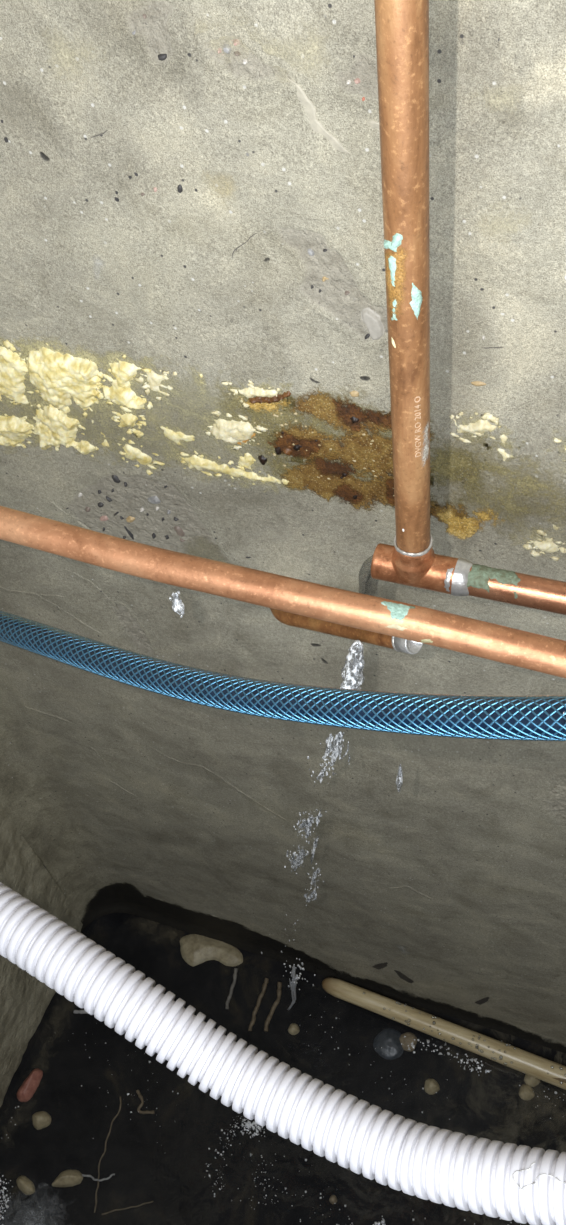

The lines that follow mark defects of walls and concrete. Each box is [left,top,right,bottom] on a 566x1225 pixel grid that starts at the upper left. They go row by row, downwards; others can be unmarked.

water stain [0,340,289,485]
corrosion [226,389,395,511]
water stain [449,412,513,461]
water stain [522,525,566,561]